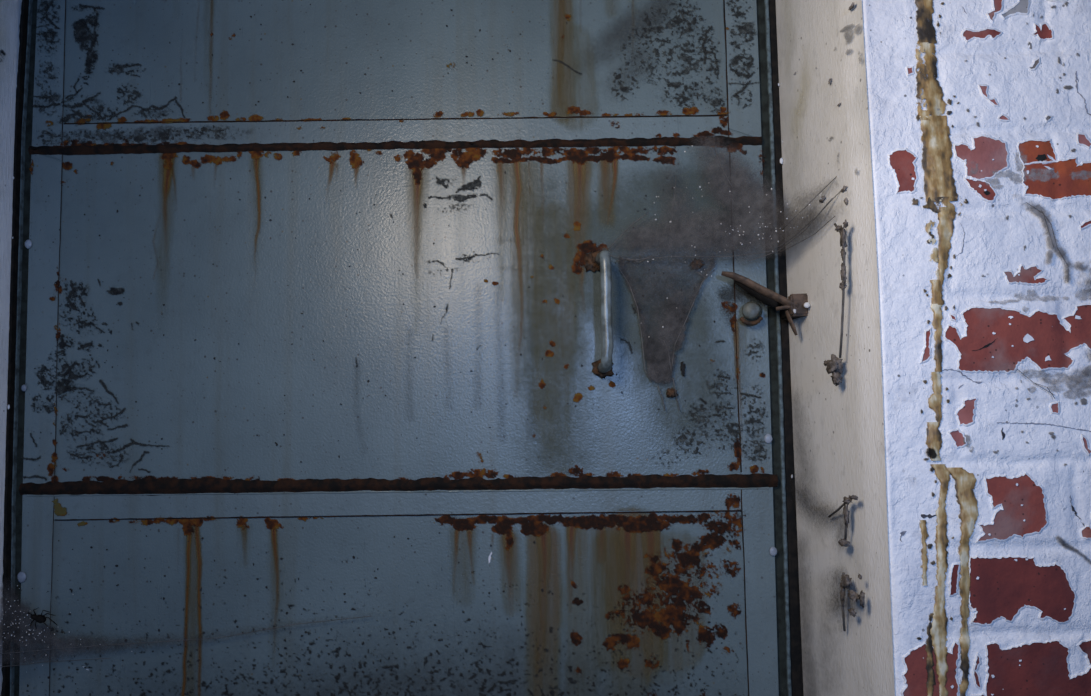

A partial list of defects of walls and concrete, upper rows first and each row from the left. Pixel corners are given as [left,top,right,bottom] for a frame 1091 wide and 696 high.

damp [612,0,759,112]
rust [53,138,302,244]
rust [323,133,680,278]
rust [694,107,766,175]
peeling [887,148,919,195]
peeling [953,132,1091,203]
damp [31,280,169,473]
damp [912,0,979,696]
peeling [920,303,1091,375]
rust [435,493,746,669]
peeling [948,472,1077,627]
peeling [901,638,1091,696]